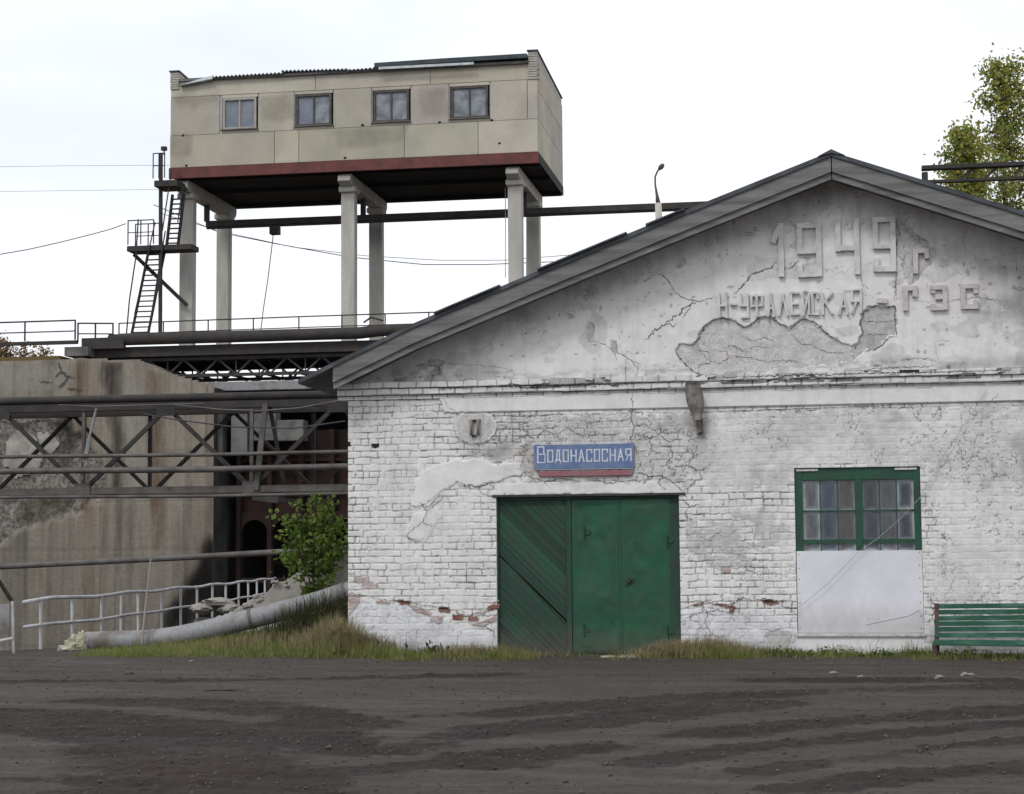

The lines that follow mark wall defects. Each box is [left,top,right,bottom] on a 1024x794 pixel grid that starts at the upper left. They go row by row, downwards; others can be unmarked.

flaking render [675,304,897,375]
crack [39,362,82,391]
crack [407,262,797,543]
spalling [2,431,59,479]
peeling [411,459,534,507]
spalling [348,593,500,635]
spalling [681,597,790,618]